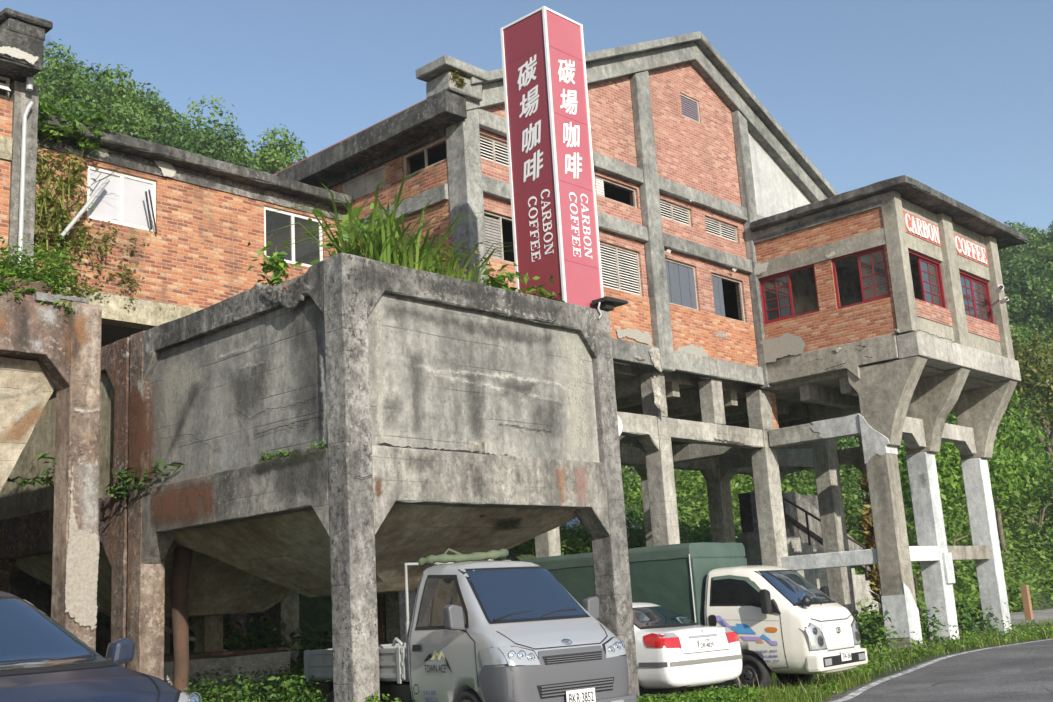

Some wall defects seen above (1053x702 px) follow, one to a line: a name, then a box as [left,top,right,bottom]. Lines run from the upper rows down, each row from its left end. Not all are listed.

peeling [0,46,39,65]
corrosion [4,407,42,440]
spalling [65,466,100,630]